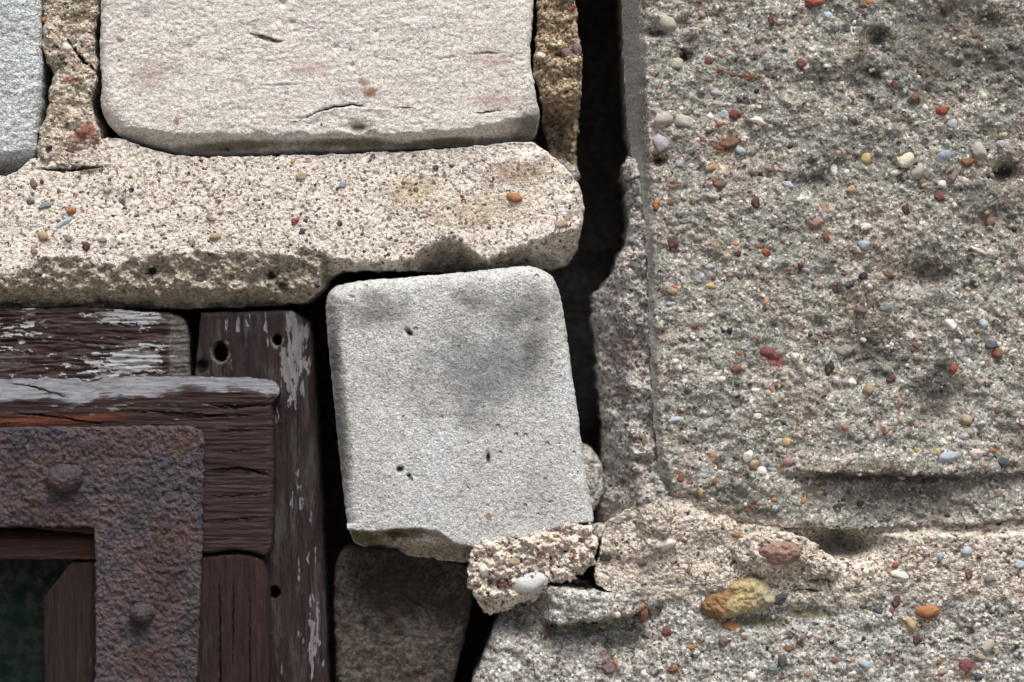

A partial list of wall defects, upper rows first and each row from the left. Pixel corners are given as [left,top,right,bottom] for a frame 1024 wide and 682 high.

crack [287,104,375,122]
peeling [0,308,52,363]
peeling [40,308,176,381]
peeling [264,311,311,422]
peeling [290,468,312,523]
peeling [297,594,324,679]